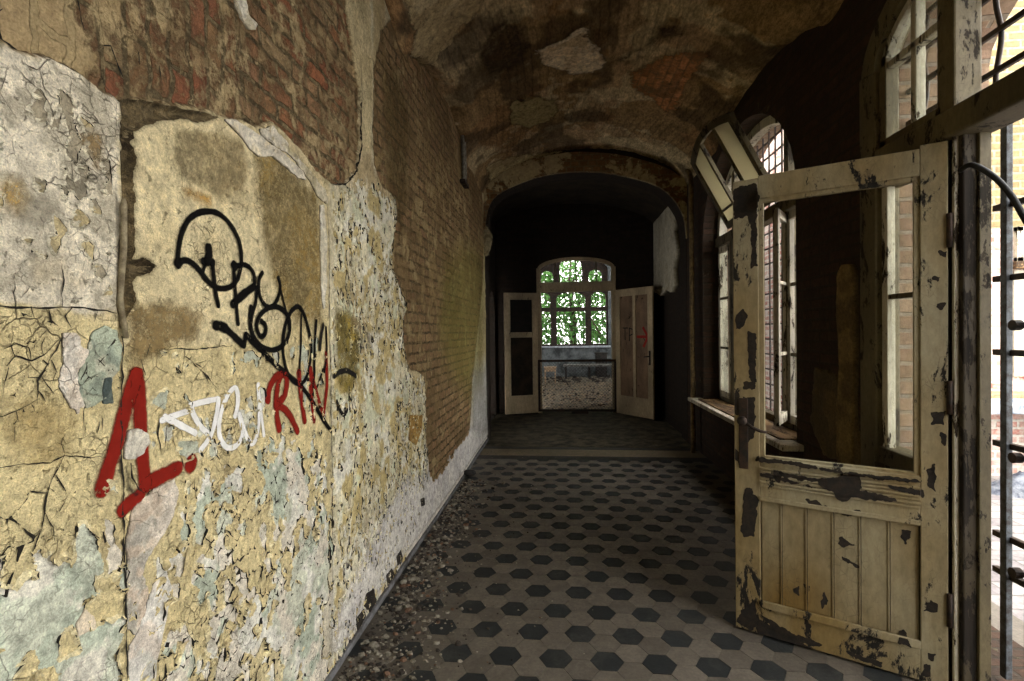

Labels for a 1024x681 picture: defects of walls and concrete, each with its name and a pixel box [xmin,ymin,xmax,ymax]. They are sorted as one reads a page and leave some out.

flaking render [535,28,606,75]
crack [0,266,229,680]
flaking render [0,0,493,681]